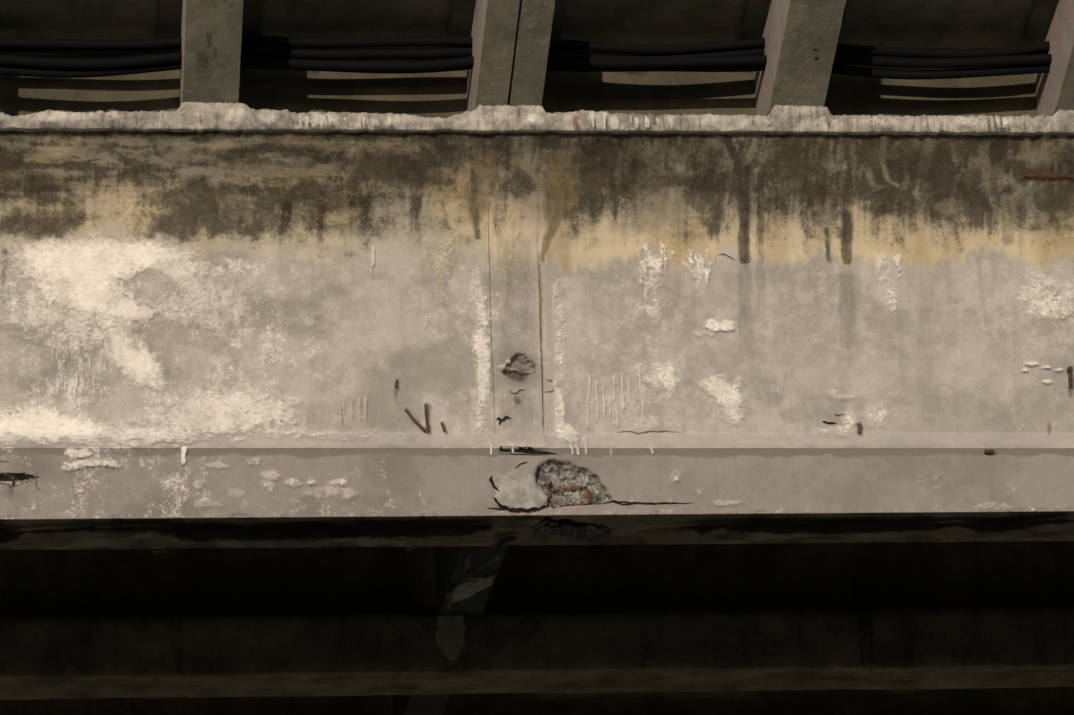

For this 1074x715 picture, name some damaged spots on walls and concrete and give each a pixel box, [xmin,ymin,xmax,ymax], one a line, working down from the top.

water stain [0,131,52,195]
water stain [0,208,84,239]
water stain [119,131,1074,263]
peeling [472,272,536,455]
spalling [530,332,680,542]
water stain [0,524,525,561]
crack [589,498,693,506]
water stain [675,519,1074,536]